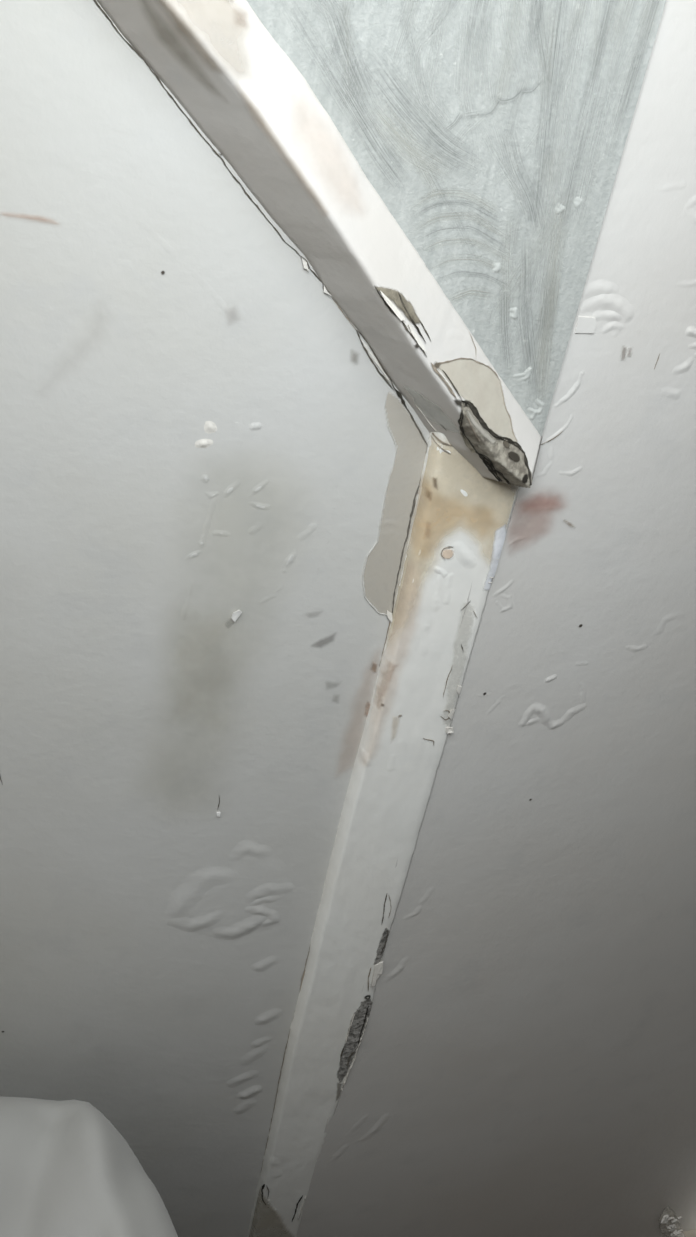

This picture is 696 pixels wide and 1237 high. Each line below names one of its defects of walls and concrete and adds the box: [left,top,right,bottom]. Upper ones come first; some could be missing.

peeling [375,287,532,488]
spalling [337,894,391,1099]
spalling [659,1206,685,1237]